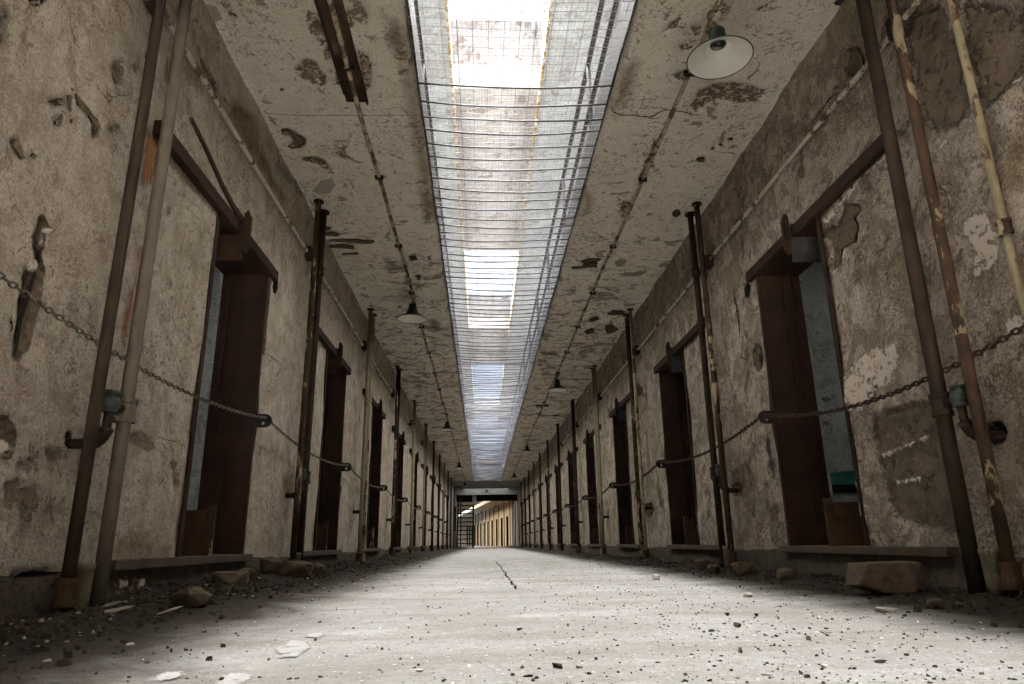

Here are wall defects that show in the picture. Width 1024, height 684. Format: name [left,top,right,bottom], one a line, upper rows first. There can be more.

peeling [112,57,137,86]
peeling [294,10,340,86]
spalling [906,3,1024,131]
spalling [48,88,121,138]
crack [610,106,698,119]
peeling [693,82,765,112]
spalling [11,138,37,160]
spalling [281,128,346,195]
spalling [824,204,861,268]